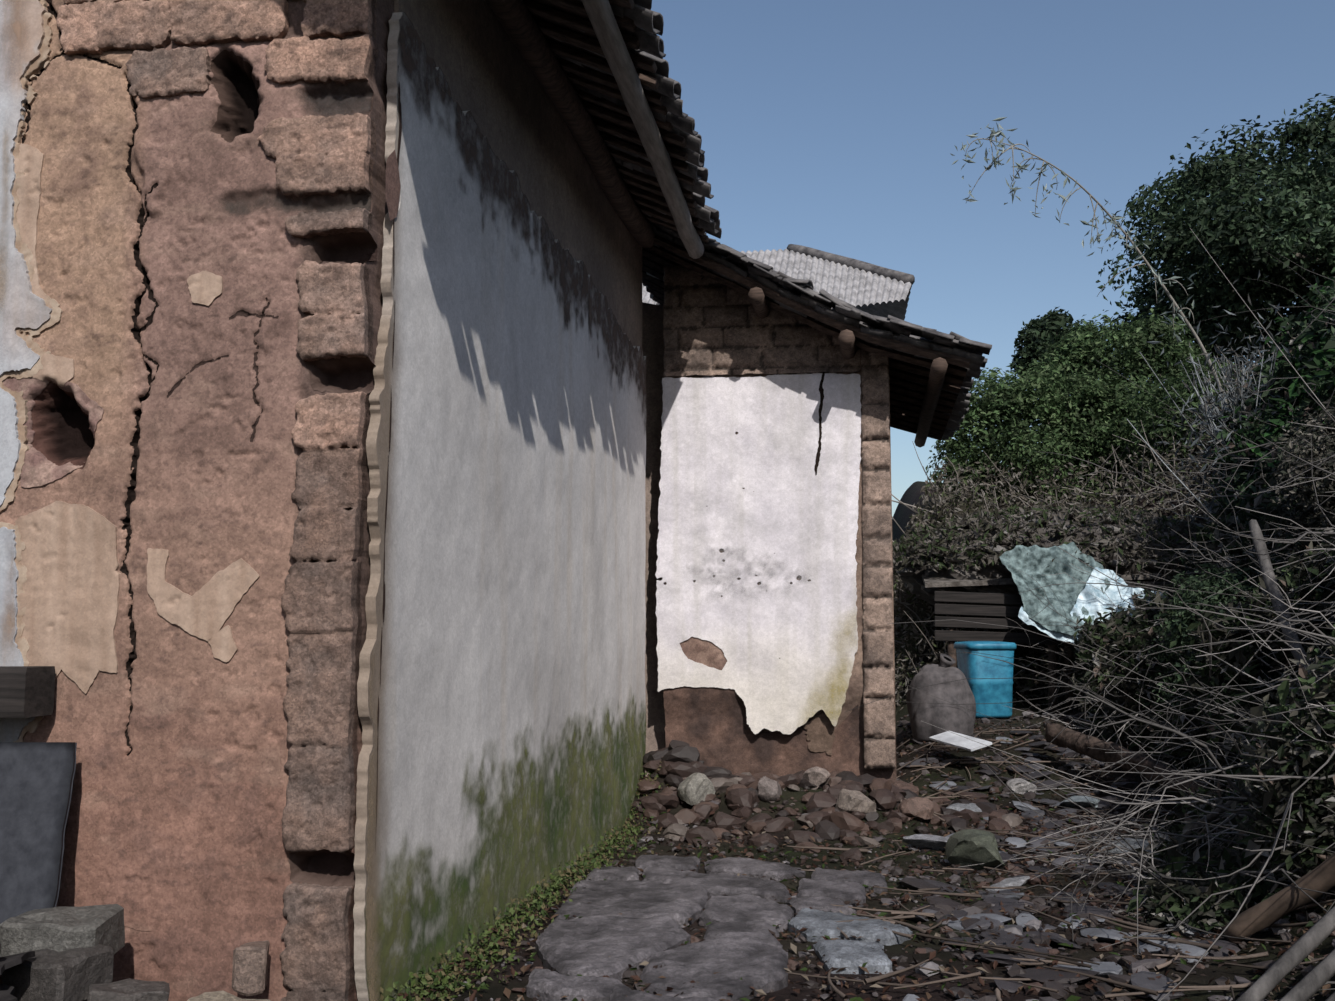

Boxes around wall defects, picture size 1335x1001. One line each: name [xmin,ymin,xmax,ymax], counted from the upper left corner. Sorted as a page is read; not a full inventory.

crack [22,0,279,756]
flaking render [0,50,377,1001]
crack [814,372,825,475]
flaking render [680,637,727,670]
flaking render [663,686,864,776]
water stain [366,768,377,1001]